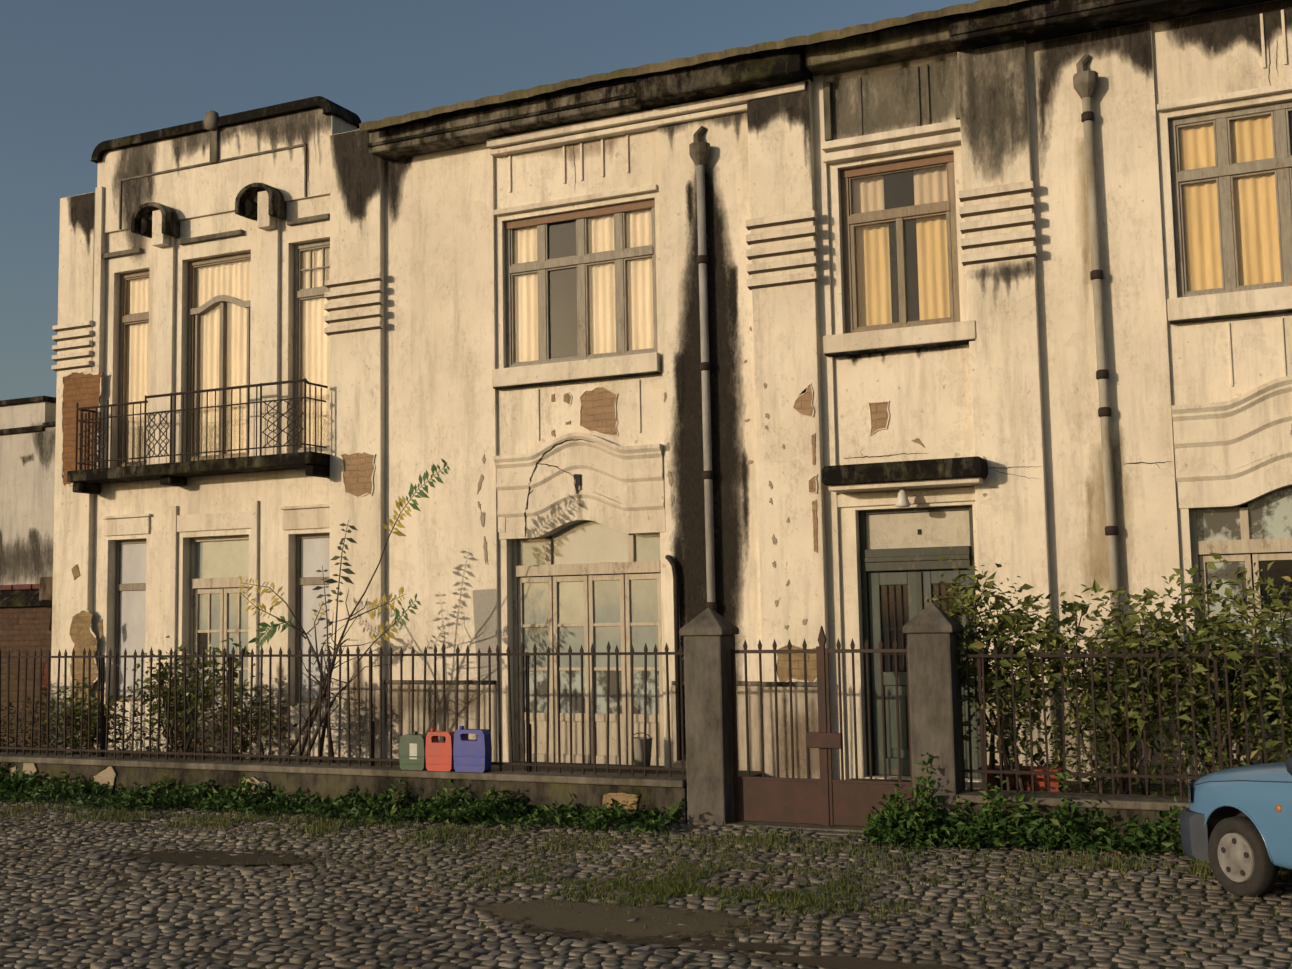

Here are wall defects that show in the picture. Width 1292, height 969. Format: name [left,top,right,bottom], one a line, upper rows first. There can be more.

damp [1167,0,1292,53]
damp [831,22,1153,171]
damp [68,192,94,247]
damp [114,142,156,255]
damp [171,108,412,220]
spalling [61,371,104,486]
spalling [340,451,376,498]
crack [524,439,595,537]
spalling [551,386,619,437]
damp [673,167,748,681]
spalling [868,401,890,436]
spalling [69,609,103,734]